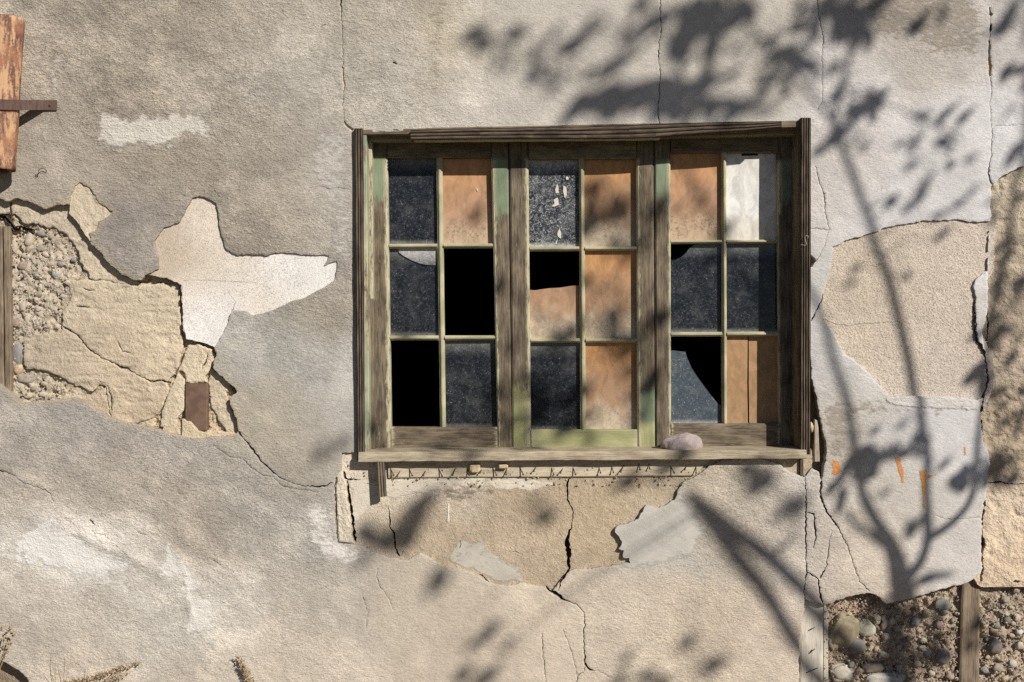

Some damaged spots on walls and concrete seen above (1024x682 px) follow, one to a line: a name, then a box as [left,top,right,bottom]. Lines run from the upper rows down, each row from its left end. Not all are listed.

spalling [0,182,337,438]
spalling [334,452,730,595]
crack [542,479,612,682]
spalling [764,386,824,476]
crack [805,482,869,603]
spalling [821,166,1024,682]